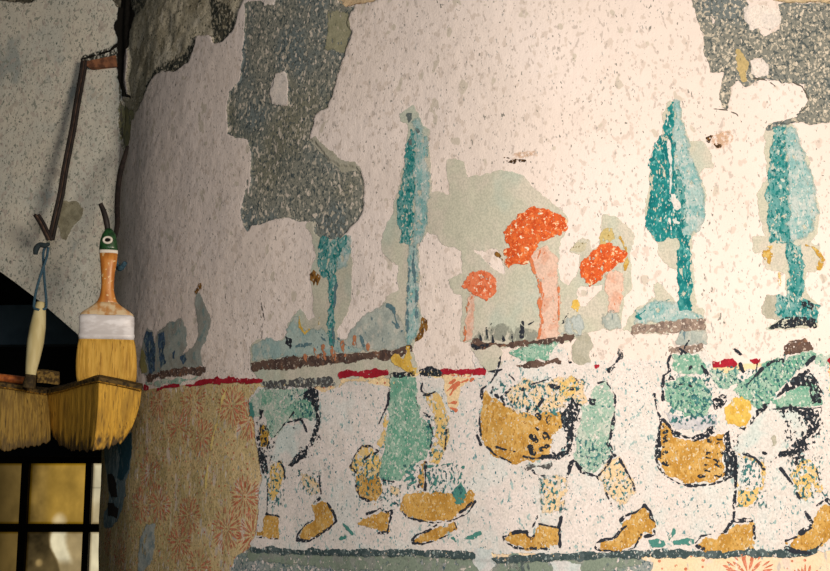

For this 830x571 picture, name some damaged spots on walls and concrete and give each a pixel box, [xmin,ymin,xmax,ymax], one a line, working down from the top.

peeling [118,0,375,342]
peeling [250,105,568,387]
peeling [534,101,714,365]
peeling [692,0,830,330]
peeling [231,548,653,571]